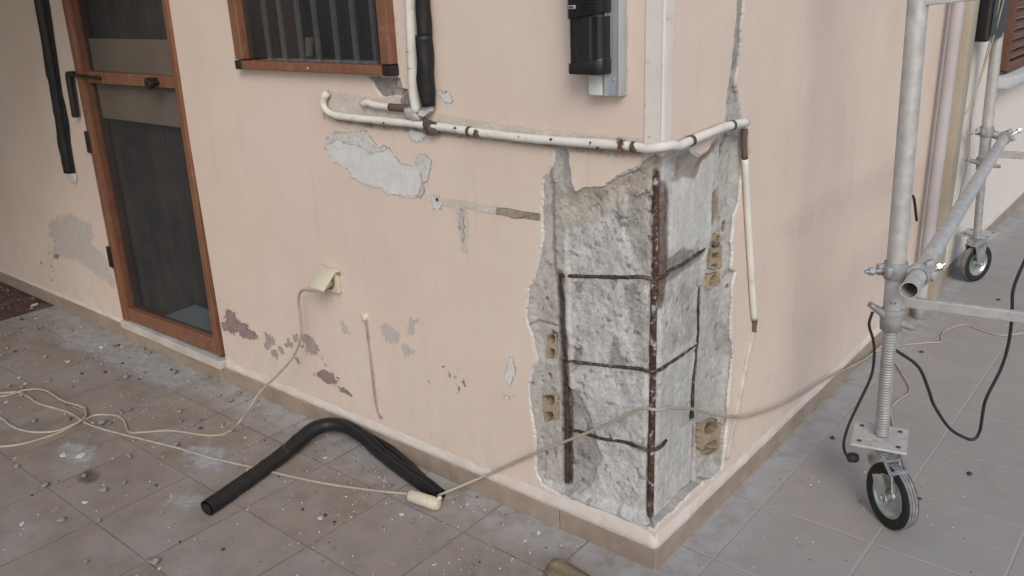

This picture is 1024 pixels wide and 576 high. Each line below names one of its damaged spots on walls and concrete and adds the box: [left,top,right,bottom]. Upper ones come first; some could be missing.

crack [726,0,746,119]
peeling [324,129,432,198]
corrosion [653,183,668,307]
peeling [220,308,352,397]
corrosion [559,277,568,406]
spalling [524,102,750,532]